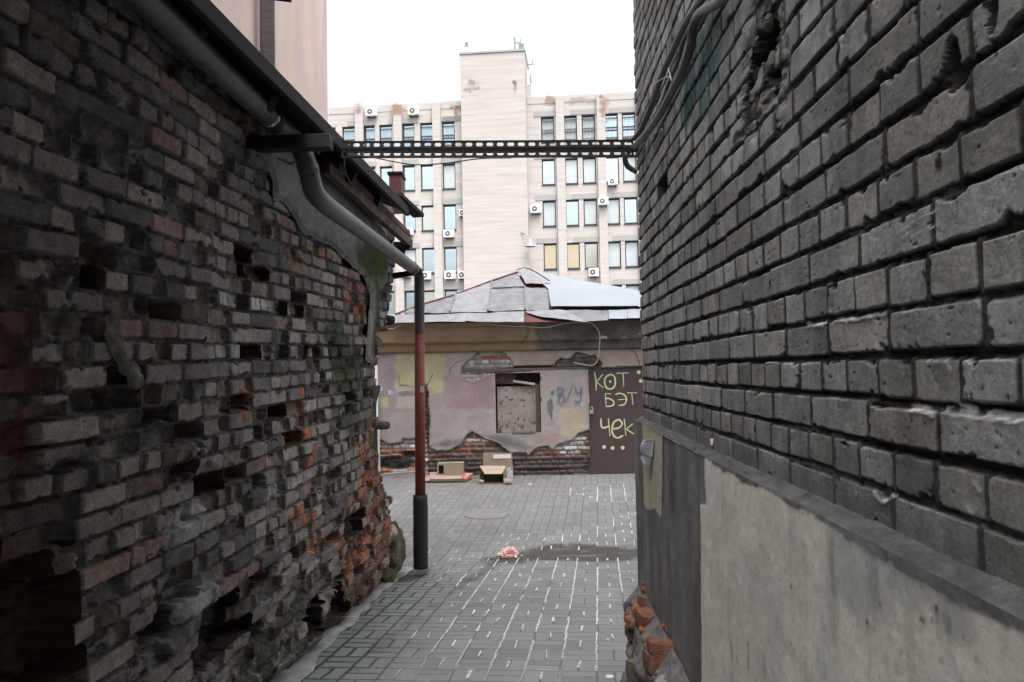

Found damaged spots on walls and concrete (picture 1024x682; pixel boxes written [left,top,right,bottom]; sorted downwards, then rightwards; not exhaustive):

spalling [460,351,514,383]
spalling [266,387,318,468]
spalling [354,388,590,494]
spalling [192,469,225,497]
spalling [287,495,393,571]
spalling [301,581,351,648]